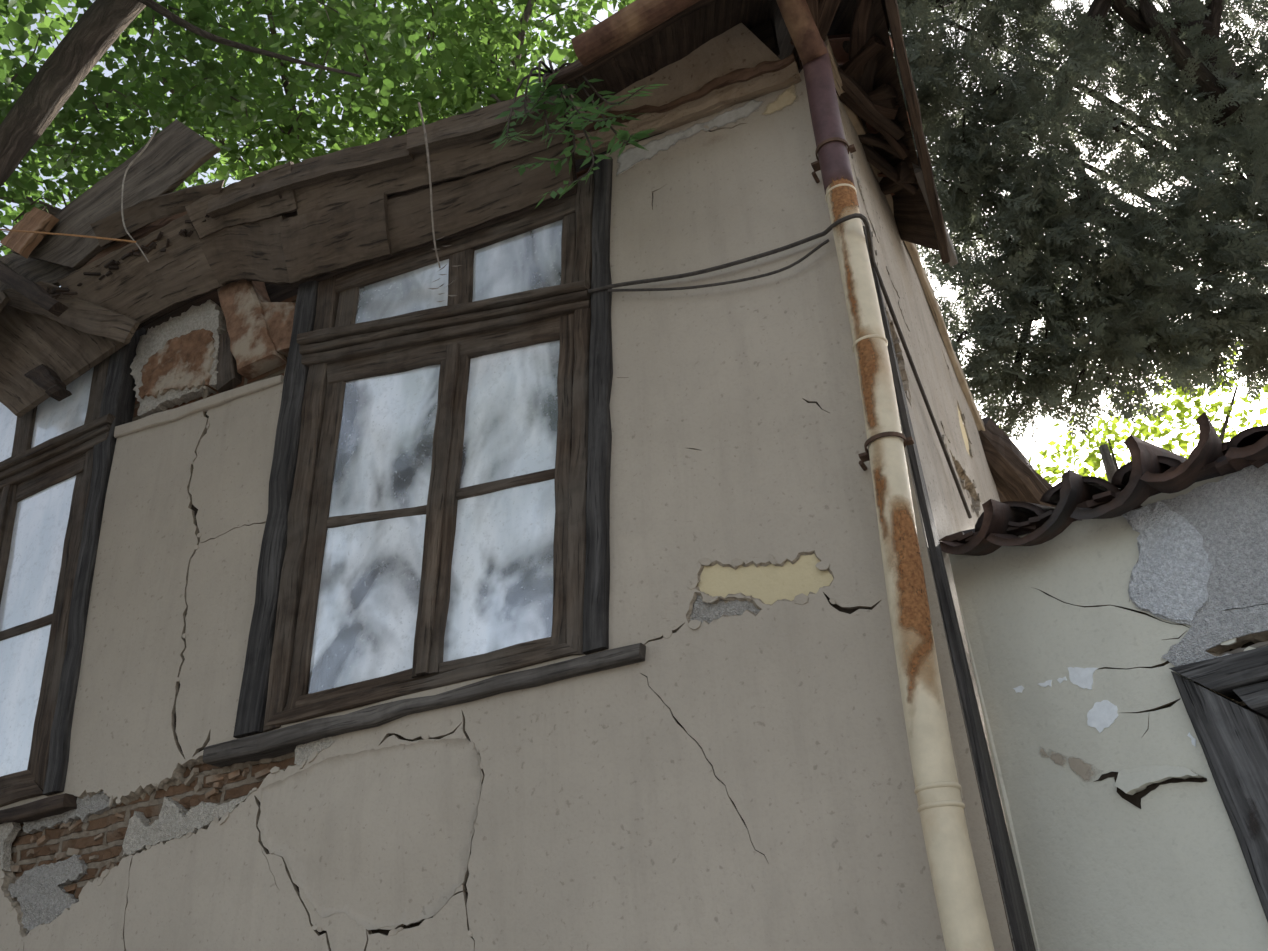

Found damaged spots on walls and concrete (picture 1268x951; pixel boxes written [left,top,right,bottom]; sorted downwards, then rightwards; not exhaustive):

corrosion [845,251,877,427]
flaking render [942,401,981,518]
crack [172,380,266,759]
flaking render [686,550,834,630]
corrosion [874,469,933,700]
crack [1032,587,1190,669]
flaking render [1122,501,1213,621]
crack [379,711,485,784]
crack [1125,699,1180,737]
flaking render [0,737,335,937]
crack [254,795,331,951]
crack [364,917,433,951]